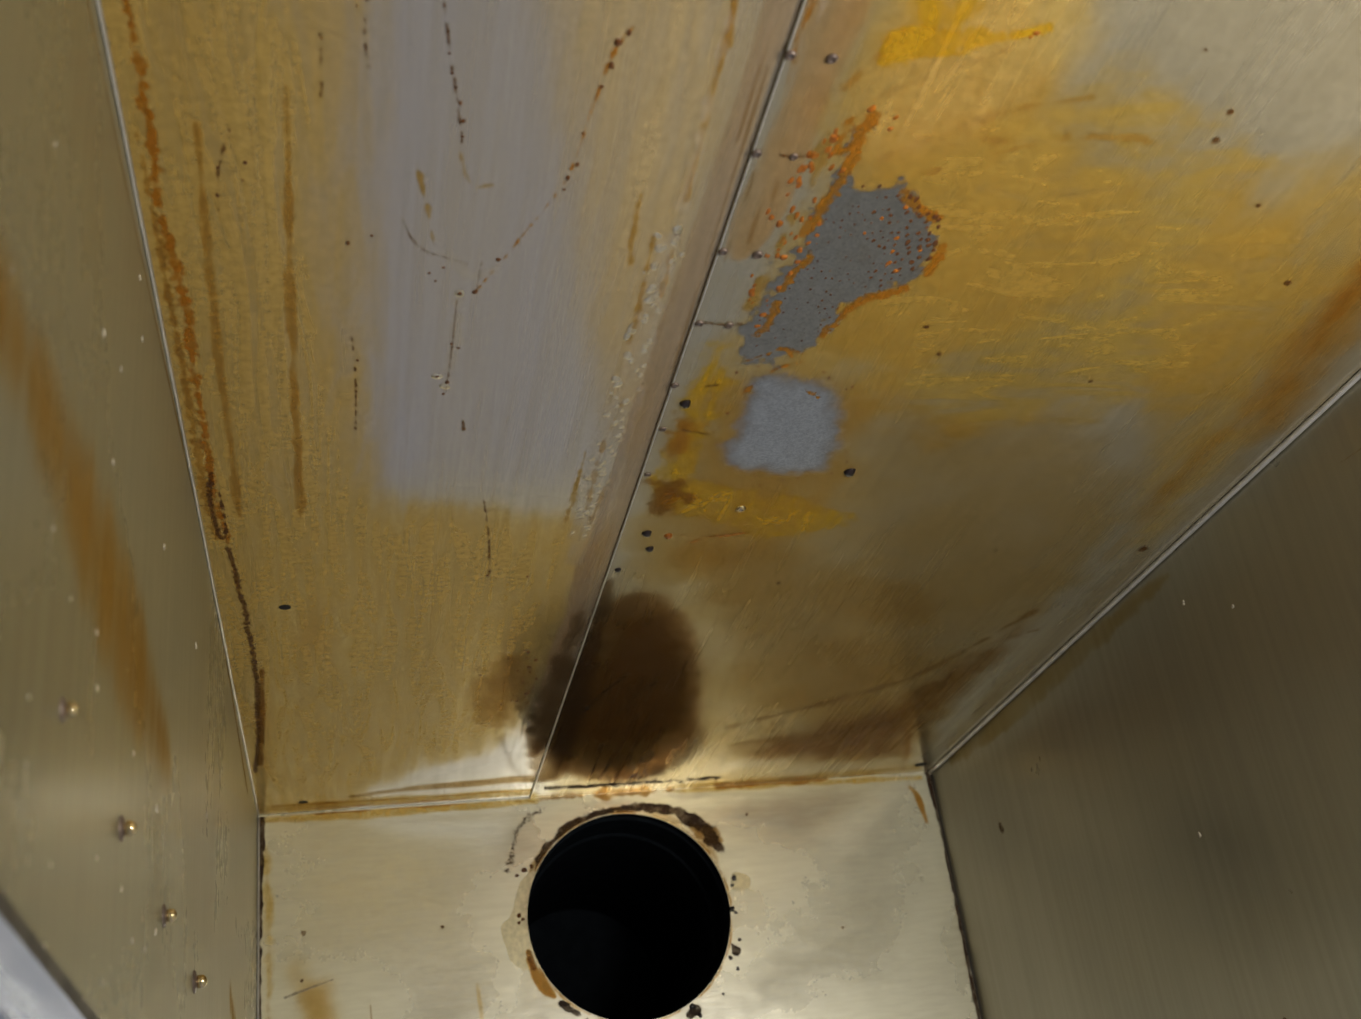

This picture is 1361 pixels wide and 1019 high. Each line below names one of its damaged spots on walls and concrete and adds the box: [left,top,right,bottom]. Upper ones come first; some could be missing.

peeling [712,105,944,486]